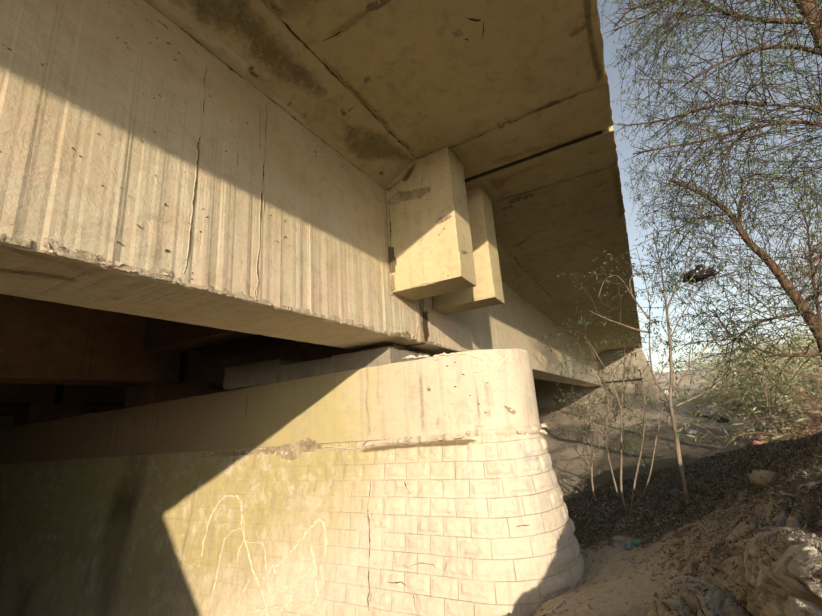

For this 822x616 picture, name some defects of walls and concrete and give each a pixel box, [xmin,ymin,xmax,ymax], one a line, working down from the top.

crack [261,0,418,159]
crack [131,0,392,298]
spalling [0,234,33,249]
spalling [43,237,374,331]
spalling [388,187,431,206]
spalling [384,330,450,349]
spalling [214,438,322,460]
crack [367,480,435,612]